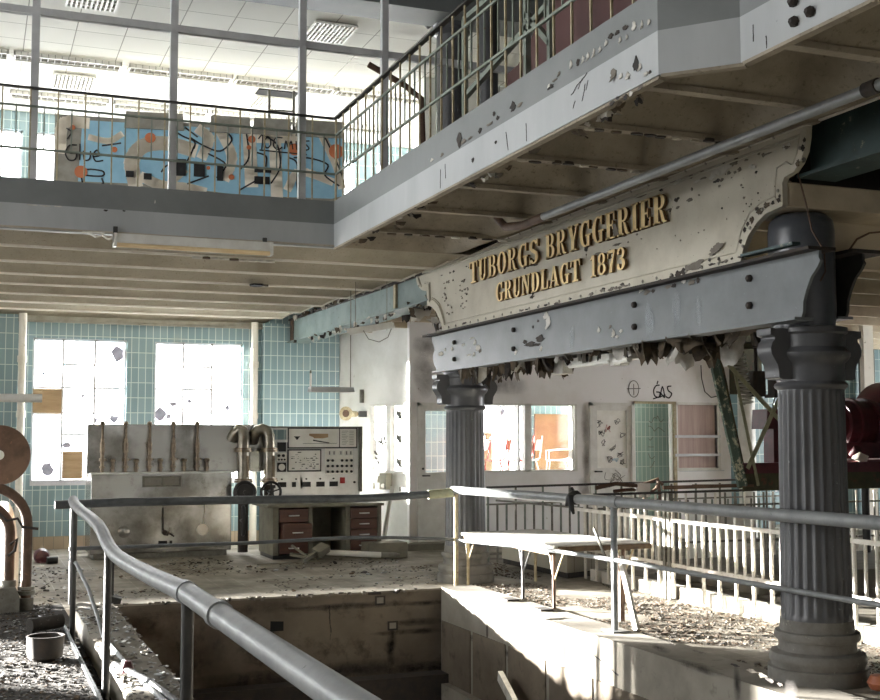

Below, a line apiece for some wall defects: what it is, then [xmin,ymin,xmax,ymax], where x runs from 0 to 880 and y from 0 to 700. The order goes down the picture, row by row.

peeling [547,19,651,90]
peeling [456,112,499,148]
spalling [572,56,721,144]
spalling [353,201,507,244]
spalling [469,148,541,188]
peeling [659,137,806,244]
peeling [293,286,384,321]
flaking render [308,270,468,342]
peeling [438,288,761,389]
peeling [639,242,744,295]